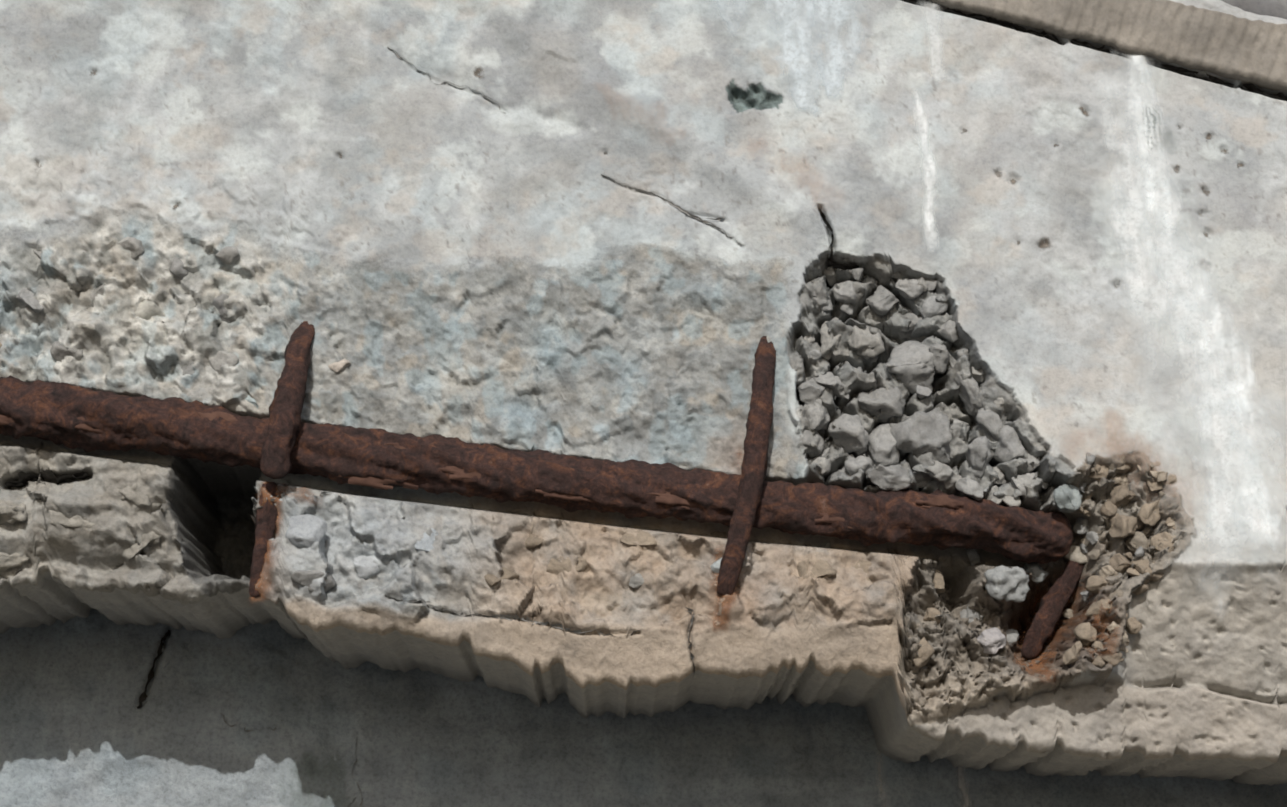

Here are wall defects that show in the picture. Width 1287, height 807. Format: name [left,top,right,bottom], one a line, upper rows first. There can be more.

water stain [1113,54,1280,549]
spalling [0,202,1198,728]
rust [252,482,282,598]
crack [137,630,170,709]
rust [1022,591,1076,677]